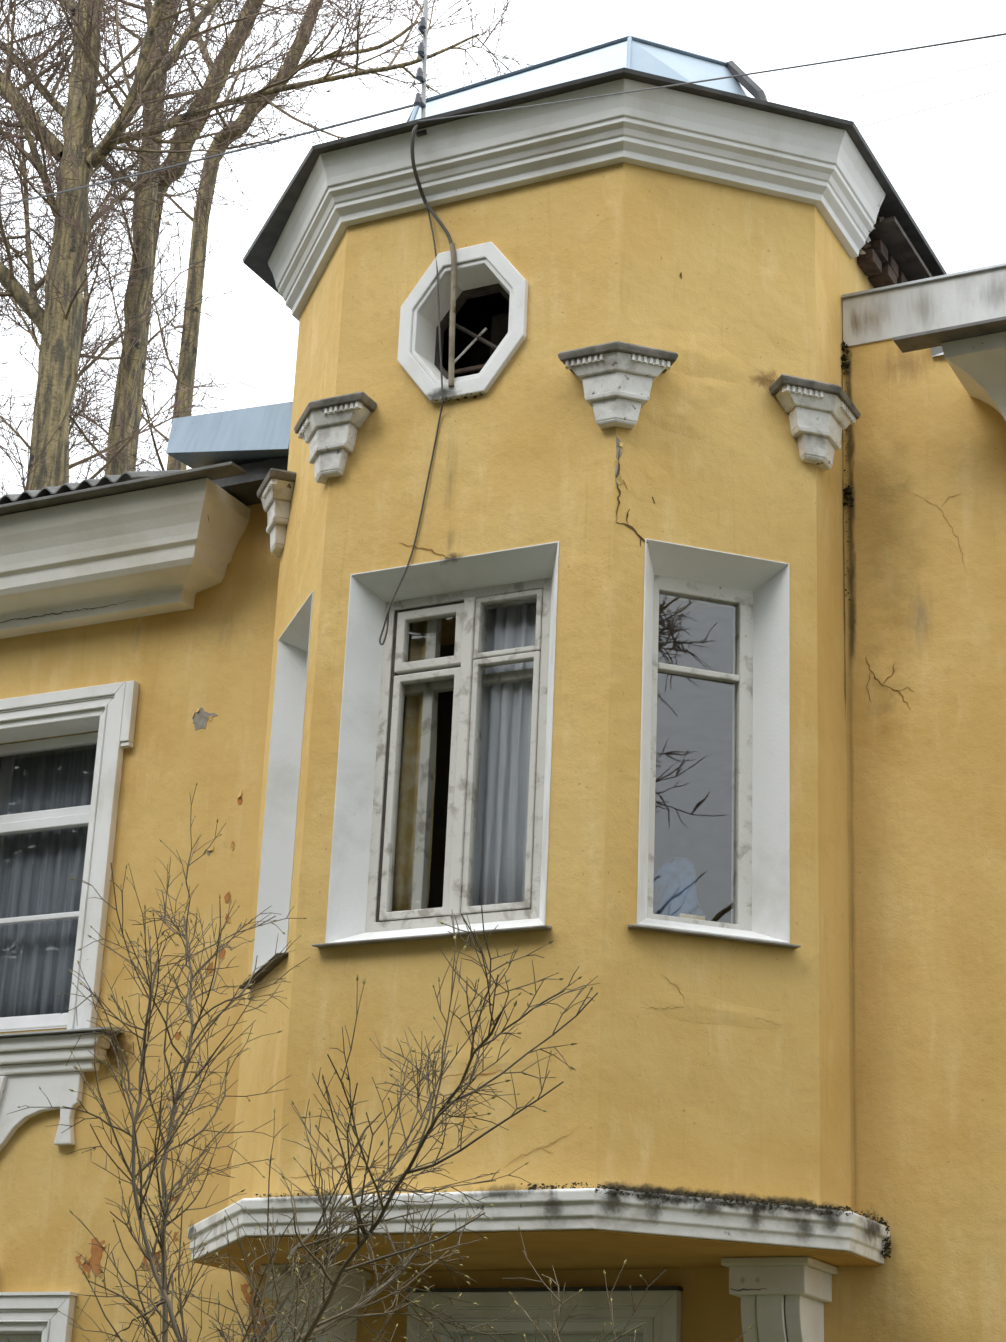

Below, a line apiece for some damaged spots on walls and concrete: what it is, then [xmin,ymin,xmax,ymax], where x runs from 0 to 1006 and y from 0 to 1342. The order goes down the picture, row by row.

crack [0,600,135,623]
crack [866,660,914,708]
peeling [190,707,218,731]
crack [285,1146,425,1180]
leakage [545,1199,560,1215]
peeling [240,1283,268,1342]